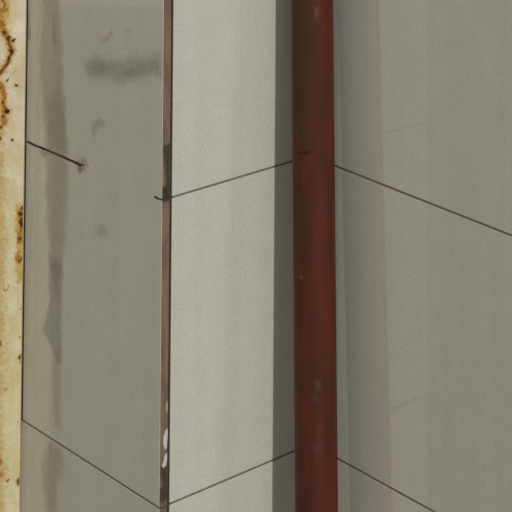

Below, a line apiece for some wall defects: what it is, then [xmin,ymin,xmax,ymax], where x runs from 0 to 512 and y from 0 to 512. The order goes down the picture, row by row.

rust [0,0,15,144]
crack [27,140,84,167]